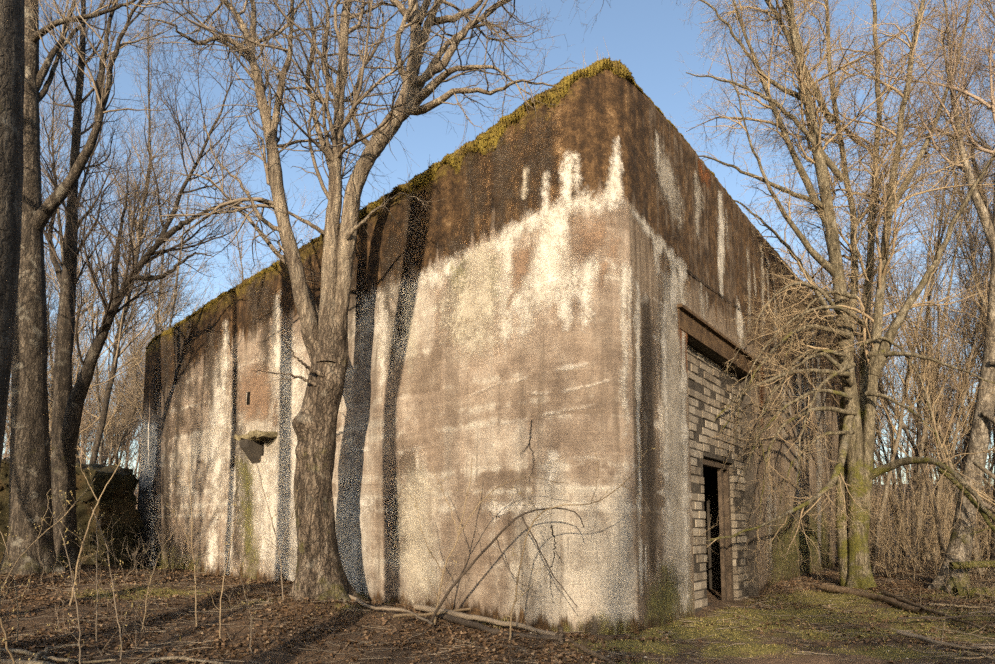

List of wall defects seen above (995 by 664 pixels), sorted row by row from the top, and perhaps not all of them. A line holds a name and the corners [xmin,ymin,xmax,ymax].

leakage [204,279,305,582]
leakage [349,135,691,613]
leakage [694,173,703,233]
leakage [718,191,728,296]